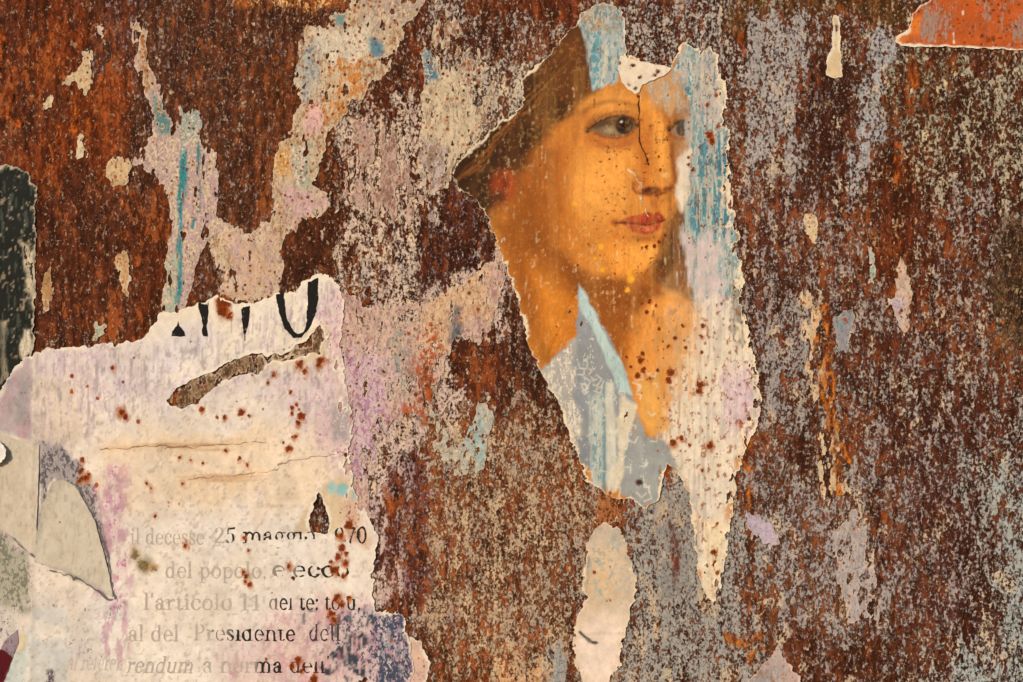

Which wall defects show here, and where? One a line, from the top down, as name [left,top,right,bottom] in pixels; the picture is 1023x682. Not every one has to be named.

peeling [106,0,505,313]
corrosion [894,142,902,186]
peeling [41,265,54,312]
corrosion [987,219,1023,354]
peeling [92,321,107,341]
peeling [170,237,506,518]
corrosion [419,364,433,425]
corrosion [814,303,851,496]
peeling [594,493,622,527]
corrosion [668,521,679,579]
peeling [745,513,780,550]